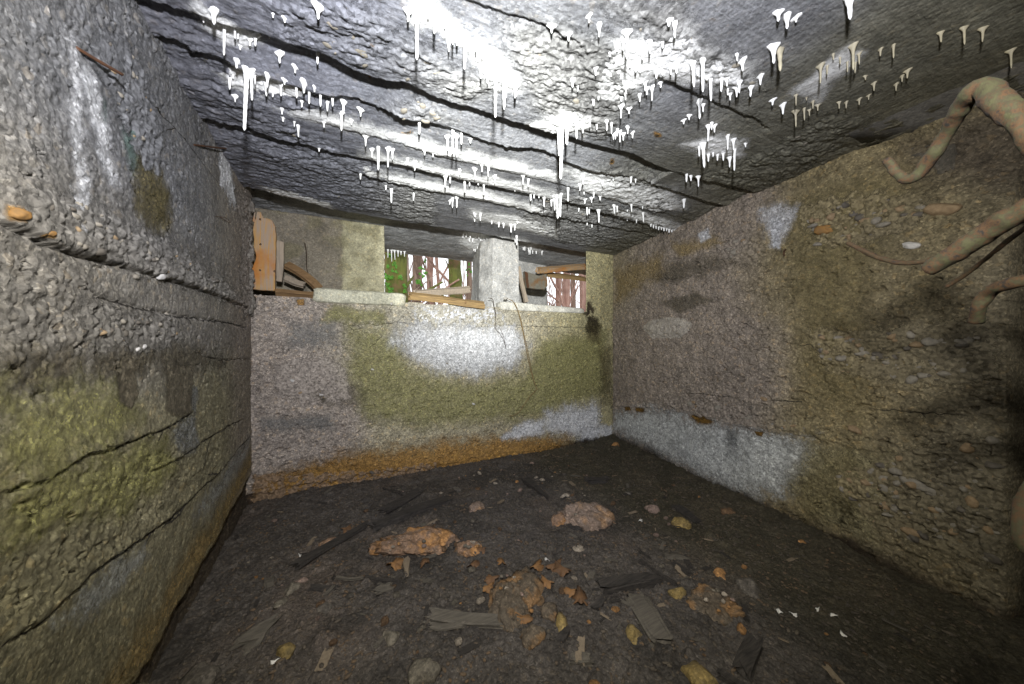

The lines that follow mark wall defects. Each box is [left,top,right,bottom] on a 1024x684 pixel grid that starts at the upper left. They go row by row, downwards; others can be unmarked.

damp [190,0,259,47]
damp [595,28,757,102]
damp [793,46,864,103]
crack [155,107,220,185]
damp [218,63,683,253]
damp [681,133,744,158]
damp [391,307,525,376]
damp [584,302,599,336]
damp [0,344,223,451]
damp [13,447,173,534]
damp [502,404,888,567]
crack [0,414,249,648]